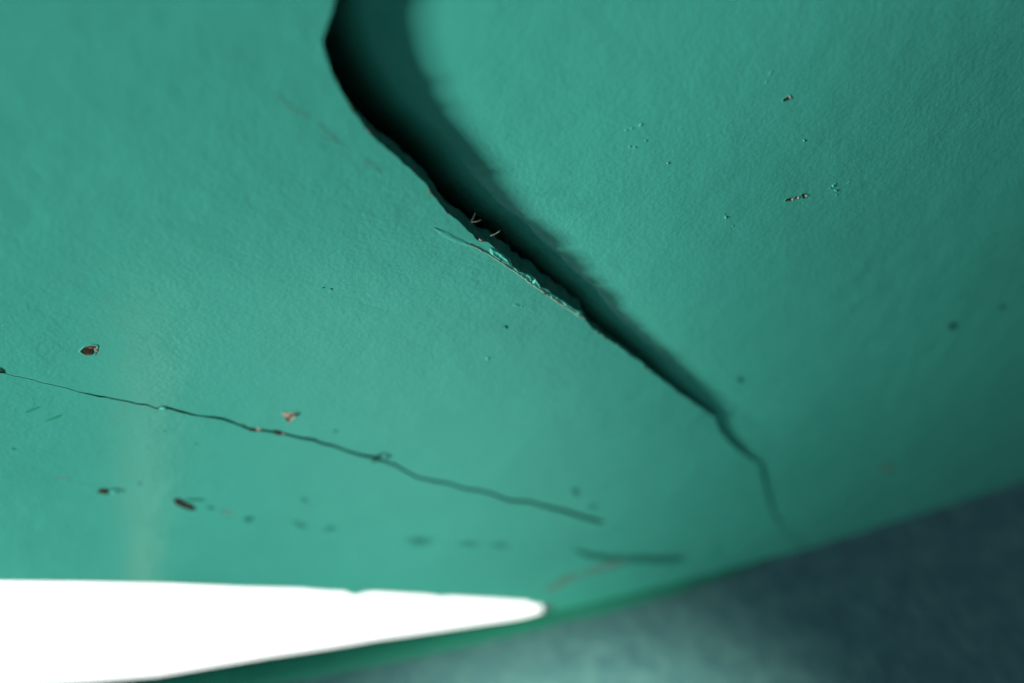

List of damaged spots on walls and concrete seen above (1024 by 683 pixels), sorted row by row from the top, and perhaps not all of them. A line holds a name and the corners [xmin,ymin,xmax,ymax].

crack [322,0,788,533]
peeling [78,344,99,357]
peeling [279,411,300,425]
crack [0,368,604,523]